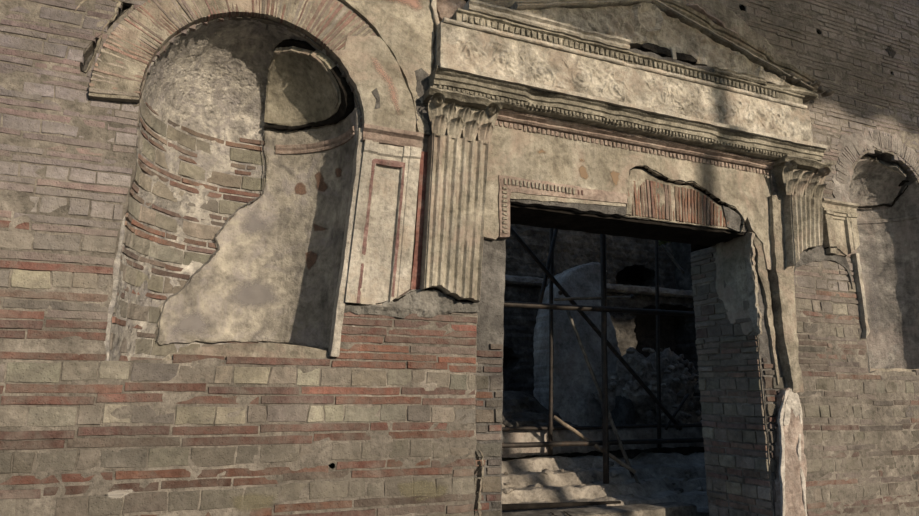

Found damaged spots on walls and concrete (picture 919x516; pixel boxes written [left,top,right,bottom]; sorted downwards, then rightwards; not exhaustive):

flaking render [157,124,268,342]
spalling [626,165,745,239]
crack [858,159,919,209]
spalling [792,245,853,289]
crack [474,450,484,516]